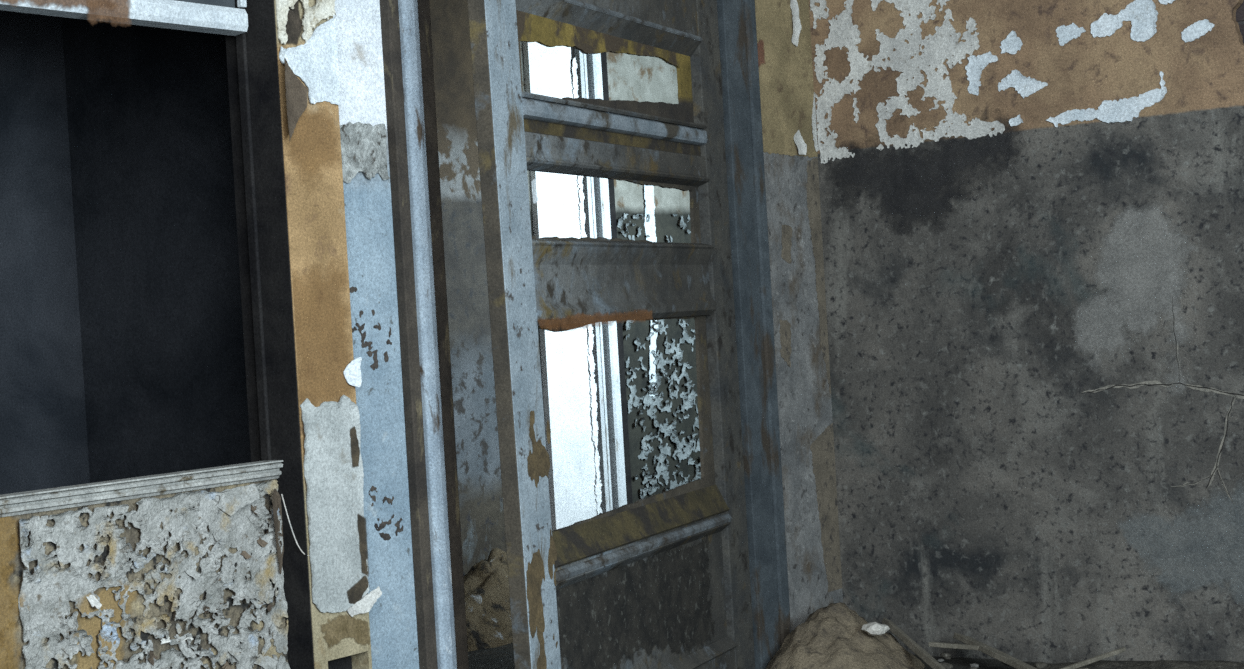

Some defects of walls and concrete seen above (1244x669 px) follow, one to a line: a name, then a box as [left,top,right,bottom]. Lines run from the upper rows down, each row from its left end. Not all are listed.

peeling [1056,0,1175,46]
peeling [1181,19,1215,42]
flaking render [1236,0,1244,43]
peeling [275,0,340,142]
peeling [998,70,1048,99]
peeling [1046,71,1167,127]
peeling [340,122,390,183]
peeling [755,0,1023,394]
peeling [300,309,403,648]
peeling [527,411,551,488]
peeling [18,480,290,669]
peeling [527,528,558,669]